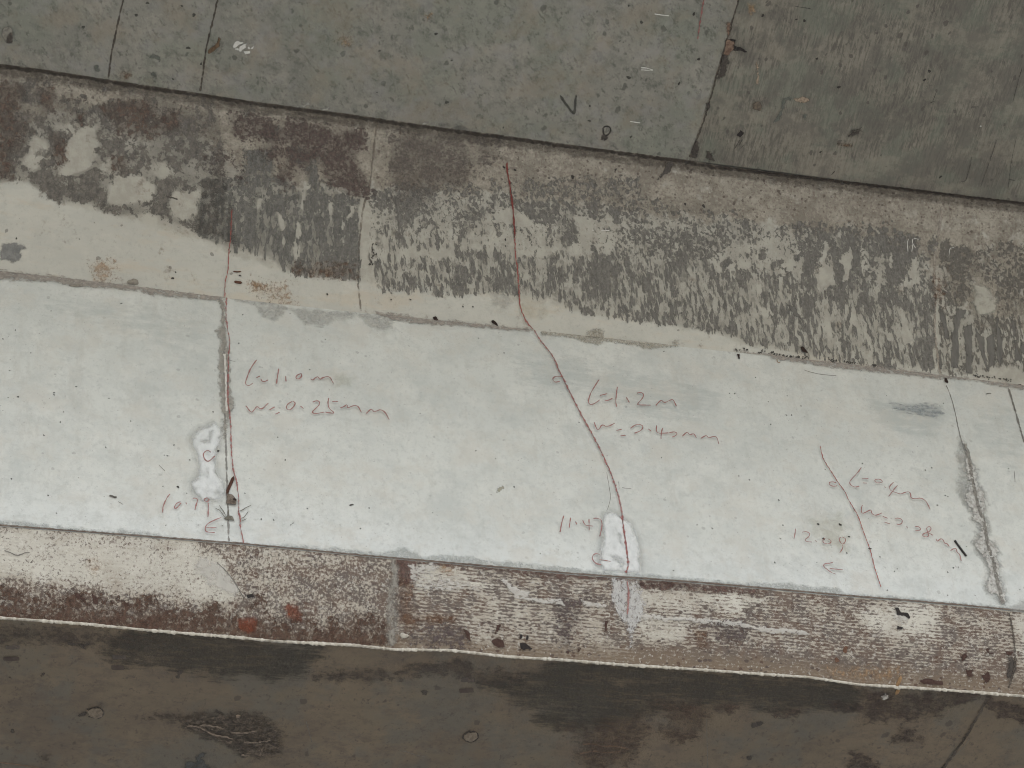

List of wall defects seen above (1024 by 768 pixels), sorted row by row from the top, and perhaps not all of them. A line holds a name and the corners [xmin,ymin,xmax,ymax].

damp [0,77,1024,390]
damp [0,243,234,499]
crack [224,211,244,543]
damp [270,513,865,648]
crack [506,163,631,614]
crack [820,446,881,587]
damp [879,441,1009,611]